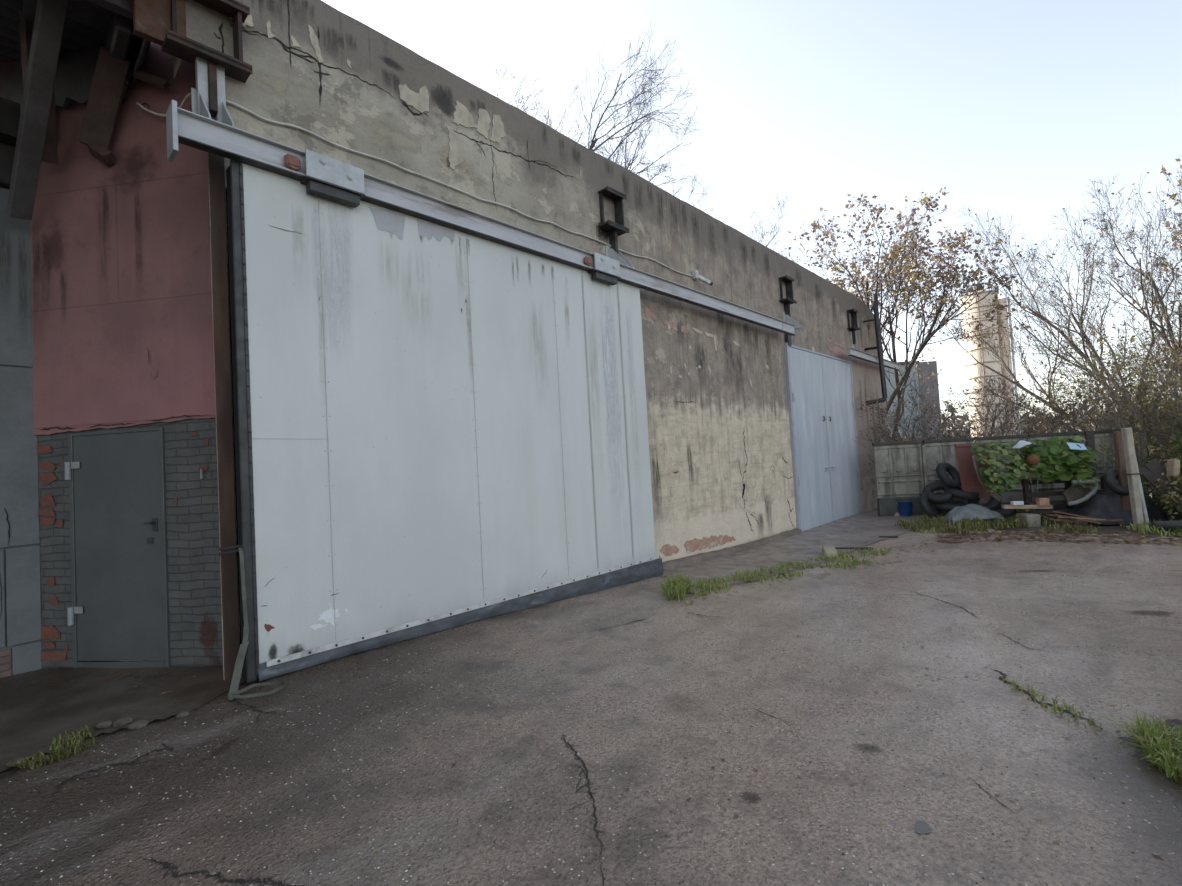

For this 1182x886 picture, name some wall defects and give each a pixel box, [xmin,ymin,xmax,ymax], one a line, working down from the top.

crack [214,0,395,101]
flaking render [398,84,429,116]
flaking render [446,101,506,170]
crack [454,130,574,212]
peeling [37,445,64,529]
crack [739,427,794,533]
flaking render [660,535,736,556]
peeling [41,625,68,662]